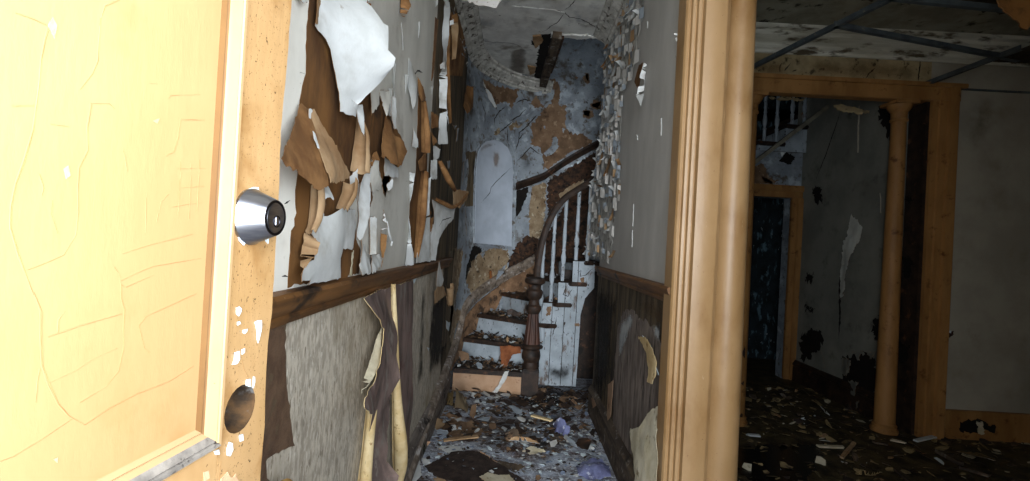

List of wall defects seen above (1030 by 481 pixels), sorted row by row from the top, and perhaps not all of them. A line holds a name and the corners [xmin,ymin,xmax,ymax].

peeling [299,0,402,216]
spalling [460,38,519,108]
peeling [523,0,645,264]
peeling [287,172,317,288]
peeling [339,230,360,279]
spalling [465,206,510,293]
peeling [236,307,262,343]
peeling [203,470,239,481]
peeling [213,434,244,456]